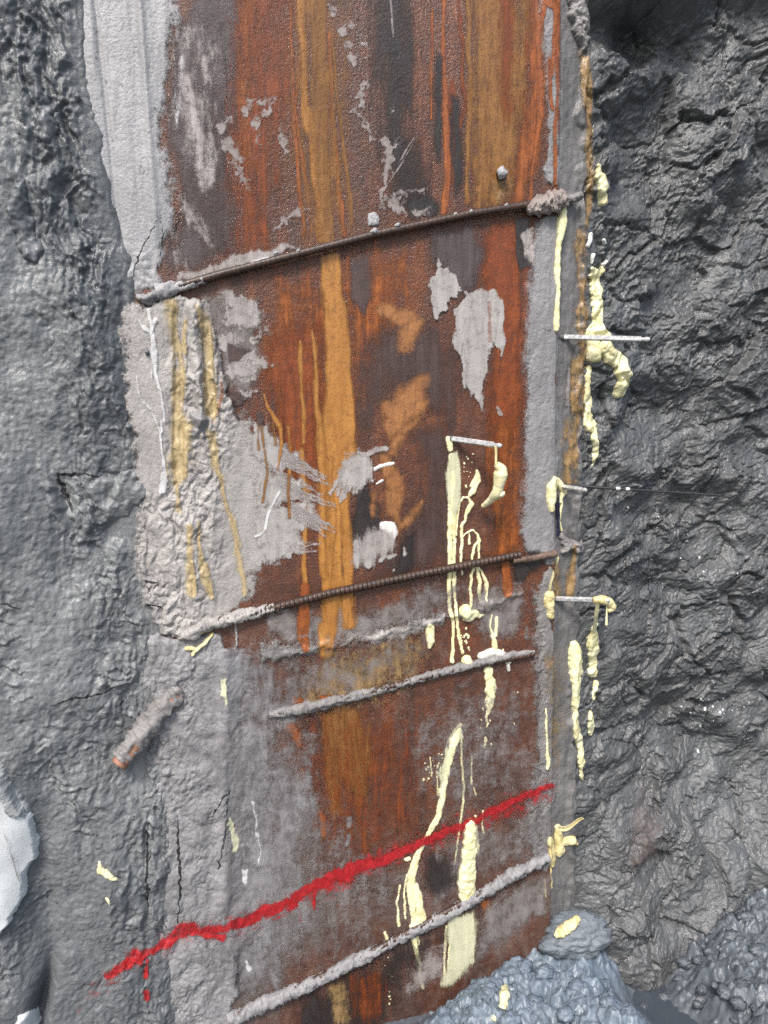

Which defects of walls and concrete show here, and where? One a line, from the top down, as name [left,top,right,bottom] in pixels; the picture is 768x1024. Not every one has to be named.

corrosion [429,0,560,215]
spalling [154,200,531,295]
corrosion [230,0,430,860]
corrosion [481,222,527,598]
crack [145,789,231,928]
corrosion [329,975,386,1024]